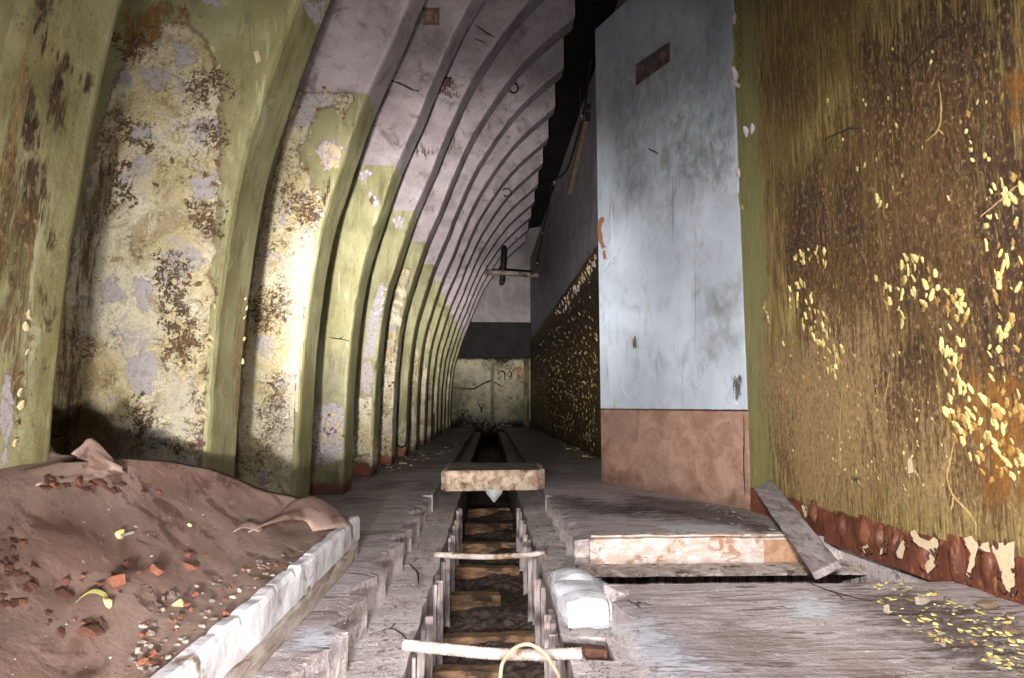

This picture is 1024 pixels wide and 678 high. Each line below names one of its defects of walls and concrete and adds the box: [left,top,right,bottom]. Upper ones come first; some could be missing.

peeling [50,20,238,466]
peeling [233,86,355,495]
peeling [312,268,412,467]
damp [753,0,1024,444]
peeling [758,36,1024,596]